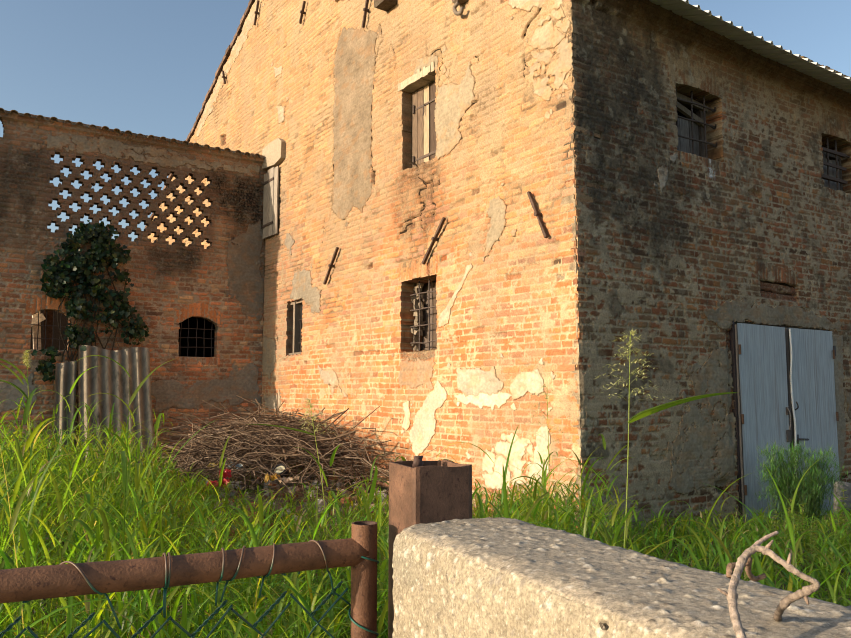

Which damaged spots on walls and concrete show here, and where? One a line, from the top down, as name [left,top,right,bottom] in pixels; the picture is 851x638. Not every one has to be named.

peeling [505,0,574,120]
peeling [416,61,476,169]
crack [399,162,441,235]
peeling [482,182,517,262]
peeling [438,252,473,328]
peeling [400,358,556,461]
peeling [482,425,556,500]